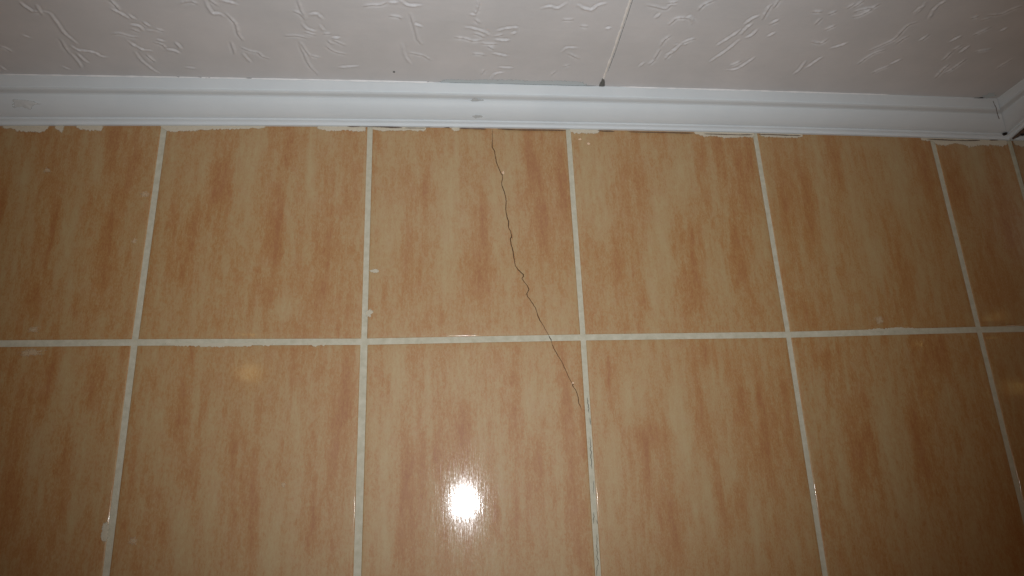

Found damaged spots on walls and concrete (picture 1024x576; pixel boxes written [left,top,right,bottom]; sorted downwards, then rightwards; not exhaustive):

crack [492,131,599,574]